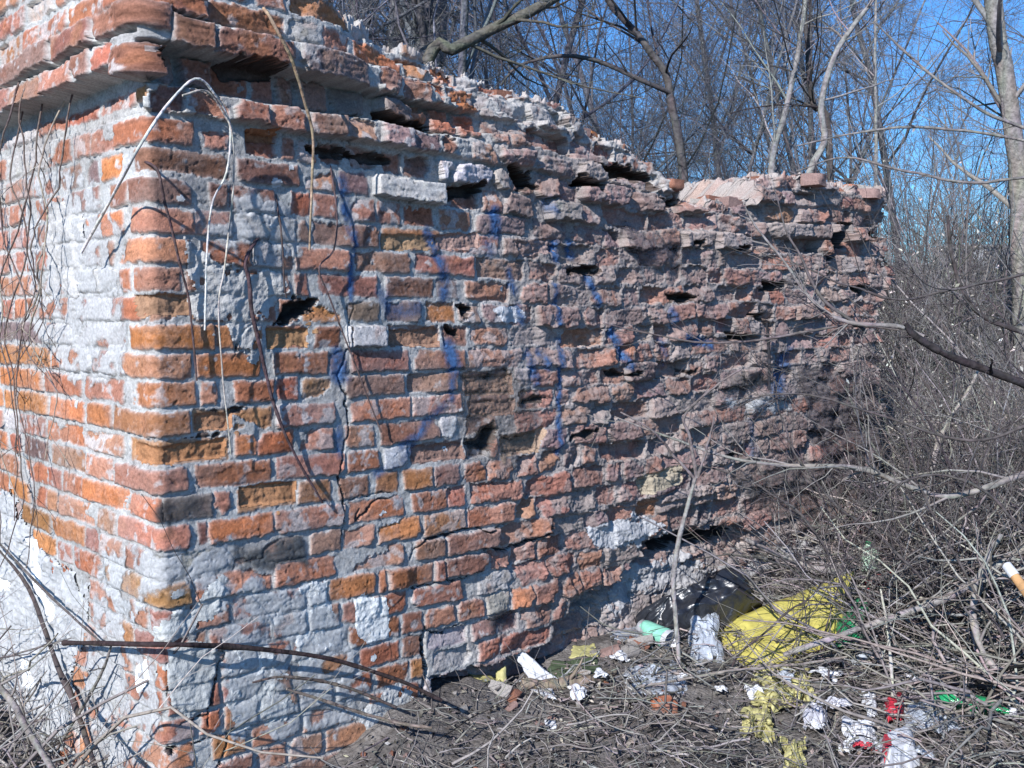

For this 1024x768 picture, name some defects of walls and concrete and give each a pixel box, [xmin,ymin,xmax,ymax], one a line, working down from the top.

spalling [370,110,432,137]
spalling [304,144,391,165]
spalling [446,179,487,200]
spalling [568,161,748,215]
spalling [266,282,319,349]
spalling [665,292,703,305]
spalling [758,279,798,292]
crack [336,322,391,535]
spalling [409,373,547,464]
crack [410,524,554,589]
spalling [644,525,730,551]
crack [419,625,457,688]